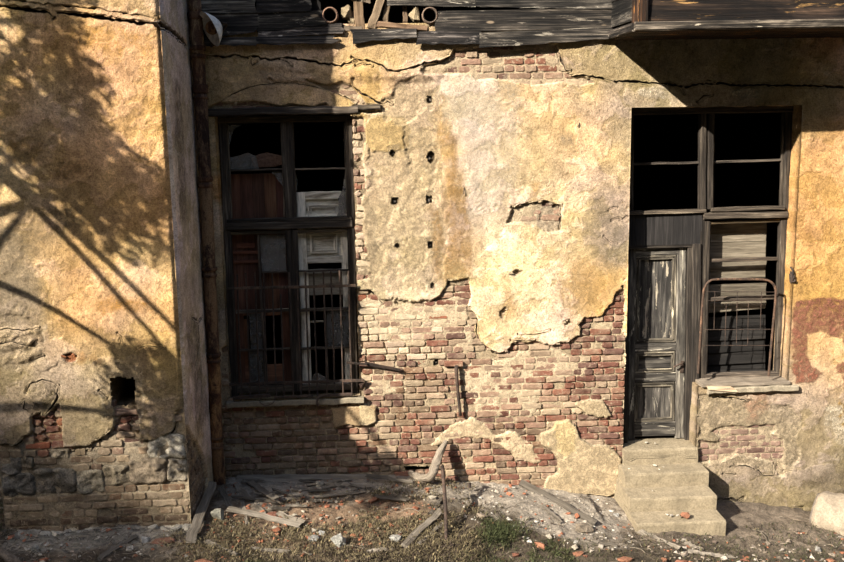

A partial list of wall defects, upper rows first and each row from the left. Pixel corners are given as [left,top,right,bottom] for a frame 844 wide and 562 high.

crack [0,0,187,47]
crack [206,50,454,112]
crack [555,45,844,102]
flaking render [222,44,626,488]
flaking render [0,328,42,363]
flaking render [0,365,207,537]
flaking render [695,394,802,473]